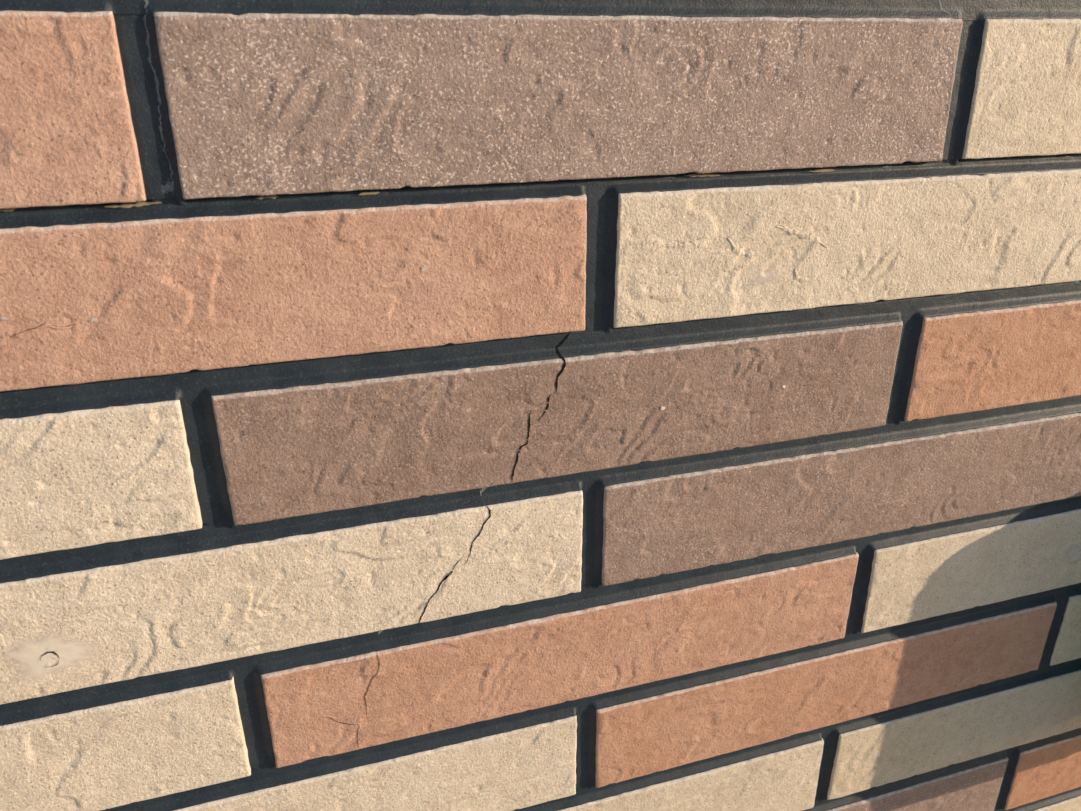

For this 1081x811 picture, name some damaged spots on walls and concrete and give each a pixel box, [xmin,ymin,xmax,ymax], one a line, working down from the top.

crack [511,332,571,481]
crack [418,506,491,624]
crack [325,650,380,747]